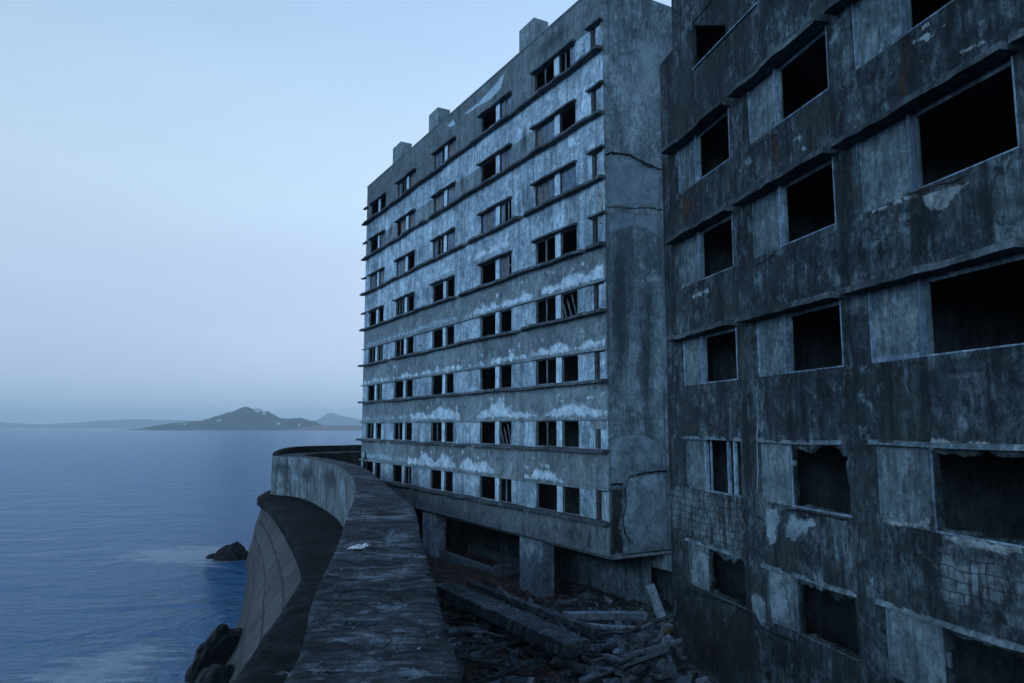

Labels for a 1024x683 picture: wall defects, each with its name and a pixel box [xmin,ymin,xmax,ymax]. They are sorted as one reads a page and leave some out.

crack [606,152,661,170]
crack [607,187,696,210]
spalling [870,182,969,215]
crack [611,470,667,544]
peeling [765,444,852,545]